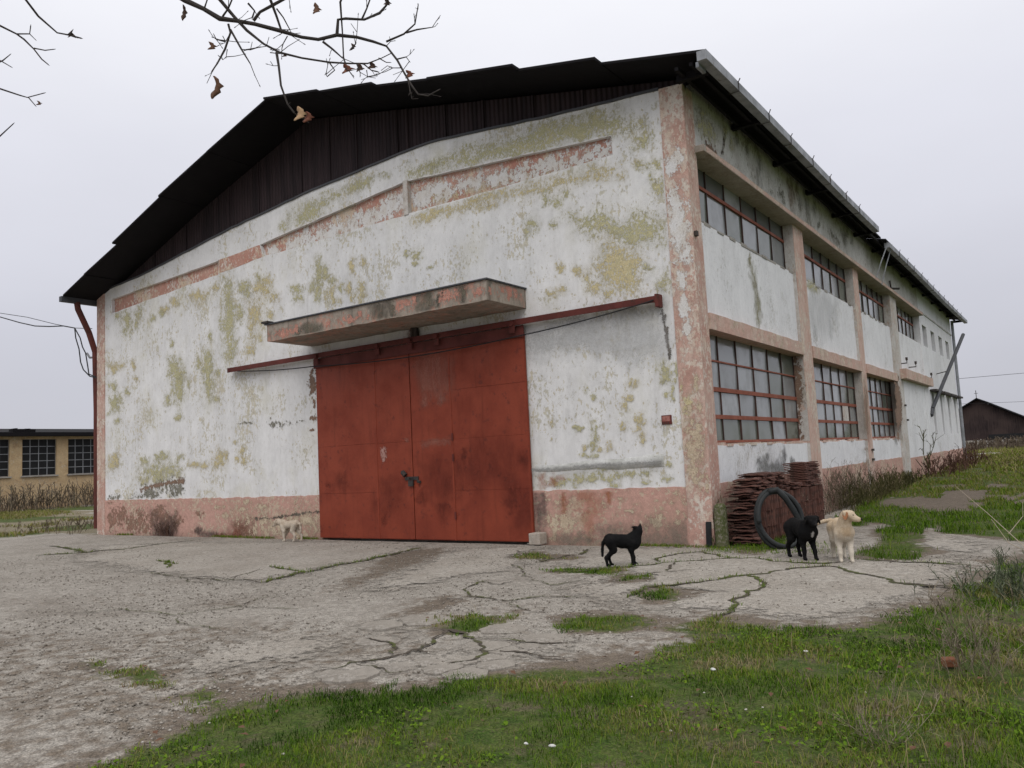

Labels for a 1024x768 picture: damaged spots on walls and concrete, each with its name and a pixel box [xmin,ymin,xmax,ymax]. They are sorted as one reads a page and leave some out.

peeling [115,106,697,421]
leakage [748,254,761,323]
spalling [266,367,317,431]
spalling [107,440,320,540]